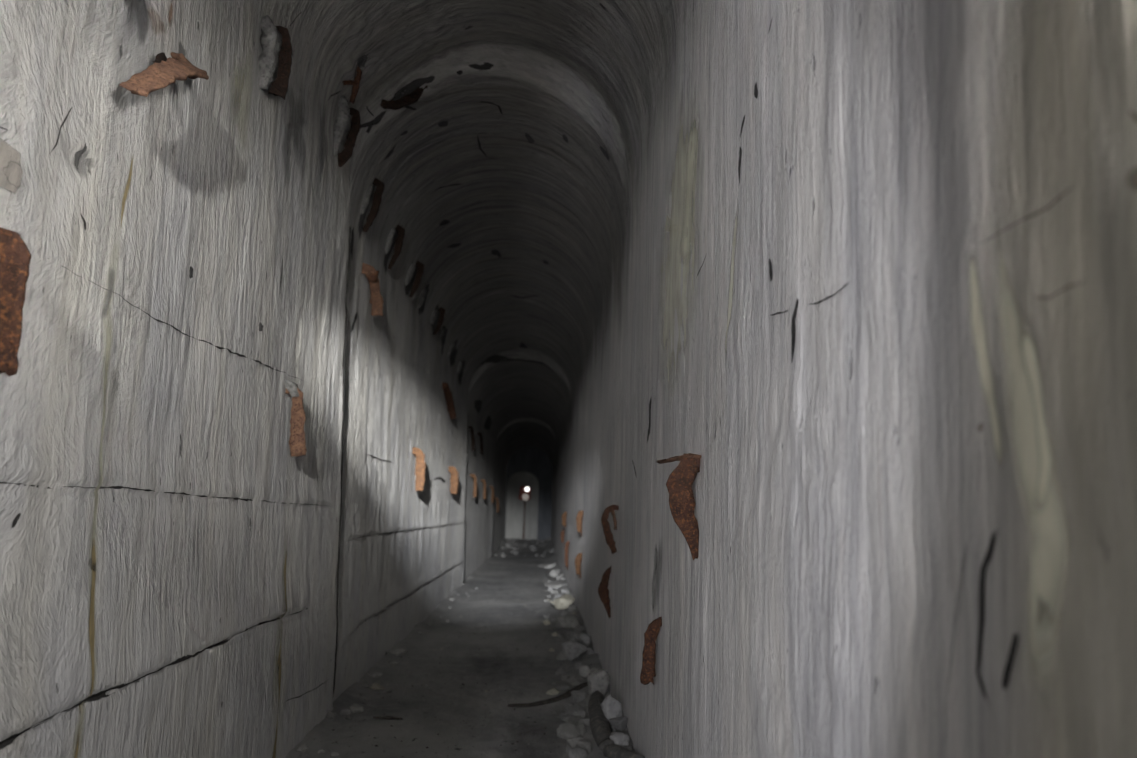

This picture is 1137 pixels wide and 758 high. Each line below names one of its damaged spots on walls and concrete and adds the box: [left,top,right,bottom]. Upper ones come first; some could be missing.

crack [0,482,328,506]
crack [12,513,21,528]
crack [0,608,308,749]